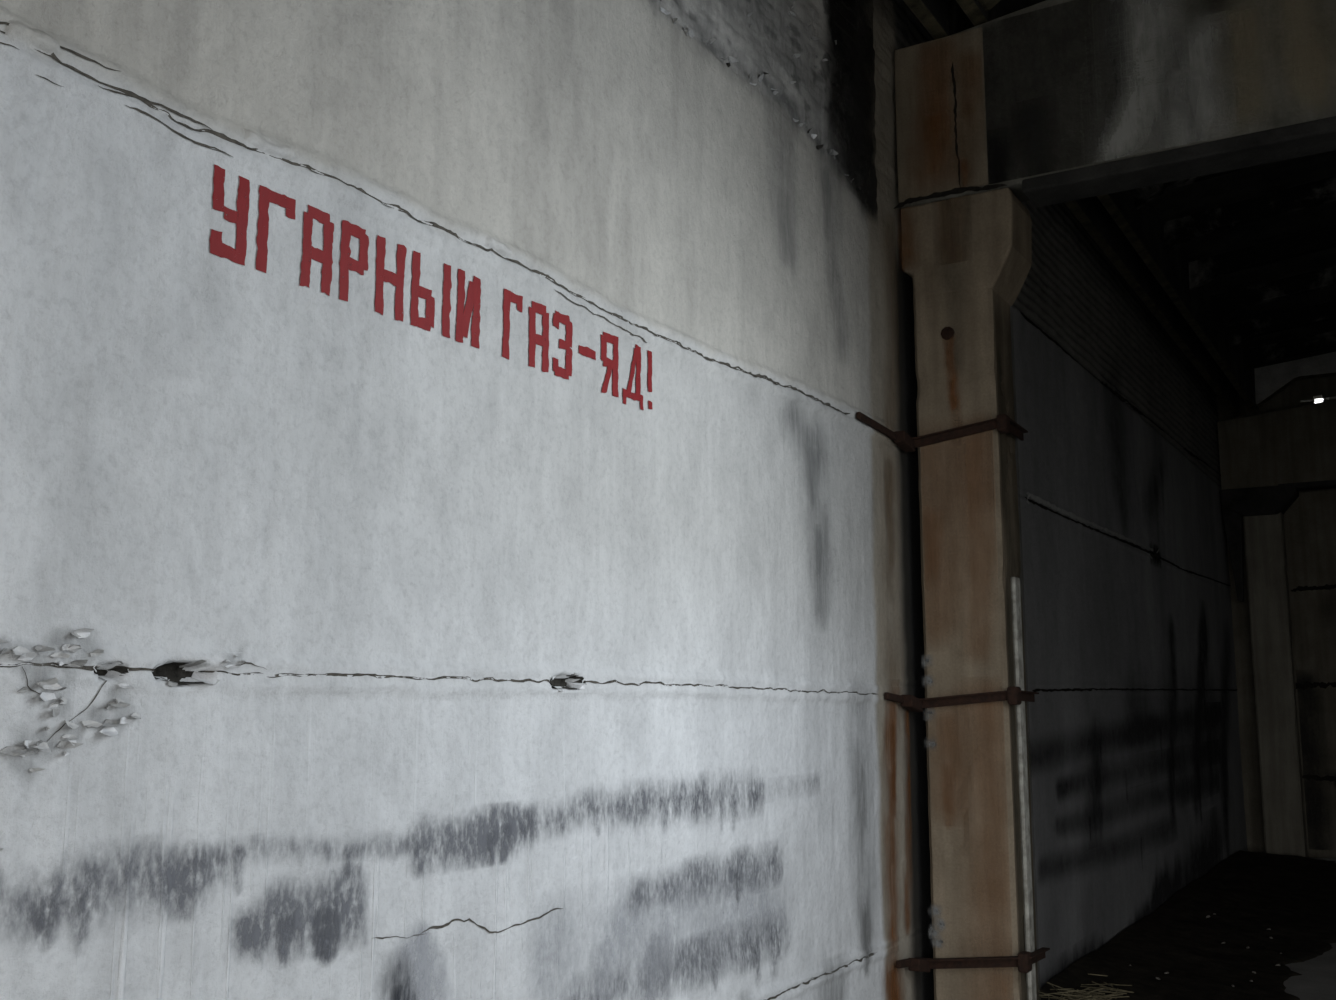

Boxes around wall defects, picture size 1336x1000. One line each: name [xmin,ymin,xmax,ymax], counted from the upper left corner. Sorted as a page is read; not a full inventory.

crack [0,22,850,415]
peeling [0,628,141,772]
crack [0,662,154,753]
crack [204,662,879,695]
rust [886,701,910,783]
water stain [399,781,758,872]
water stain [18,852,219,937]
water stain [236,853,363,963]
crack [375,908,563,939]
water stain [607,854,778,988]
rust [889,854,909,943]
rust [886,962,901,1000]